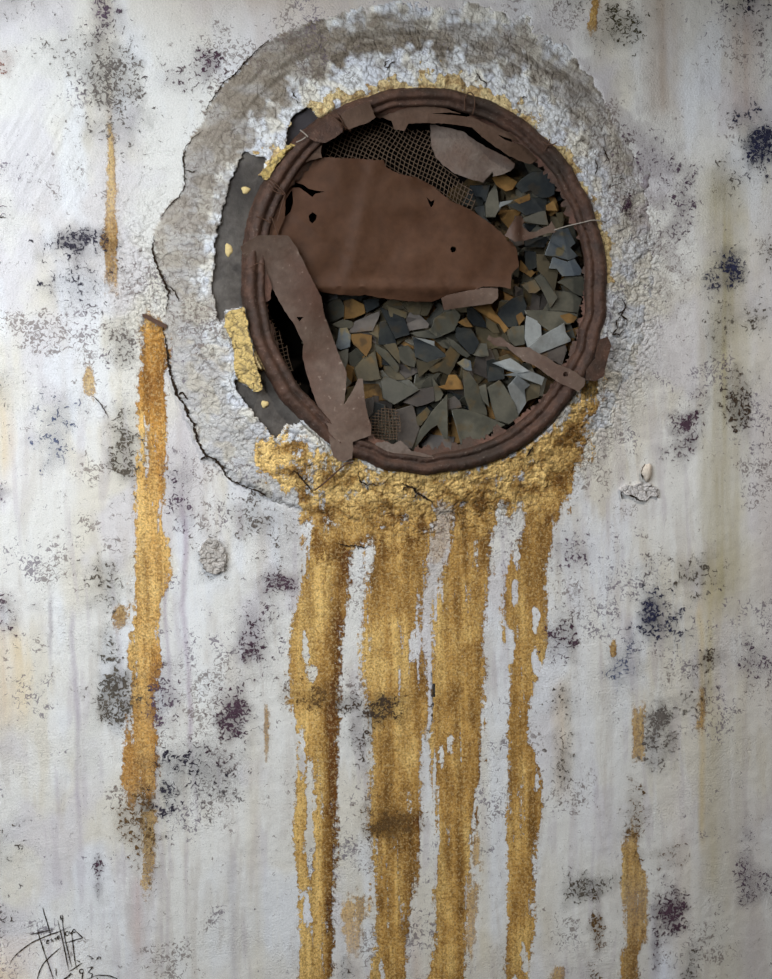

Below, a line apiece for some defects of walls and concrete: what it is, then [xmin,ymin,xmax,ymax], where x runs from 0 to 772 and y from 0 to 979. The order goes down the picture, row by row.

water stain [32,0,148,163]
rust [99,124,118,284]
flaking render [261,144,295,180]
rust [278,157,538,334]
rust [306,60,615,283]
water stain [713,97,772,207]
water stain [699,244,768,445]
rust [111,311,173,895]
water stain [101,404,305,886]
rust [254,378,607,979]
water stain [602,554,725,691]
rust [619,825,649,979]